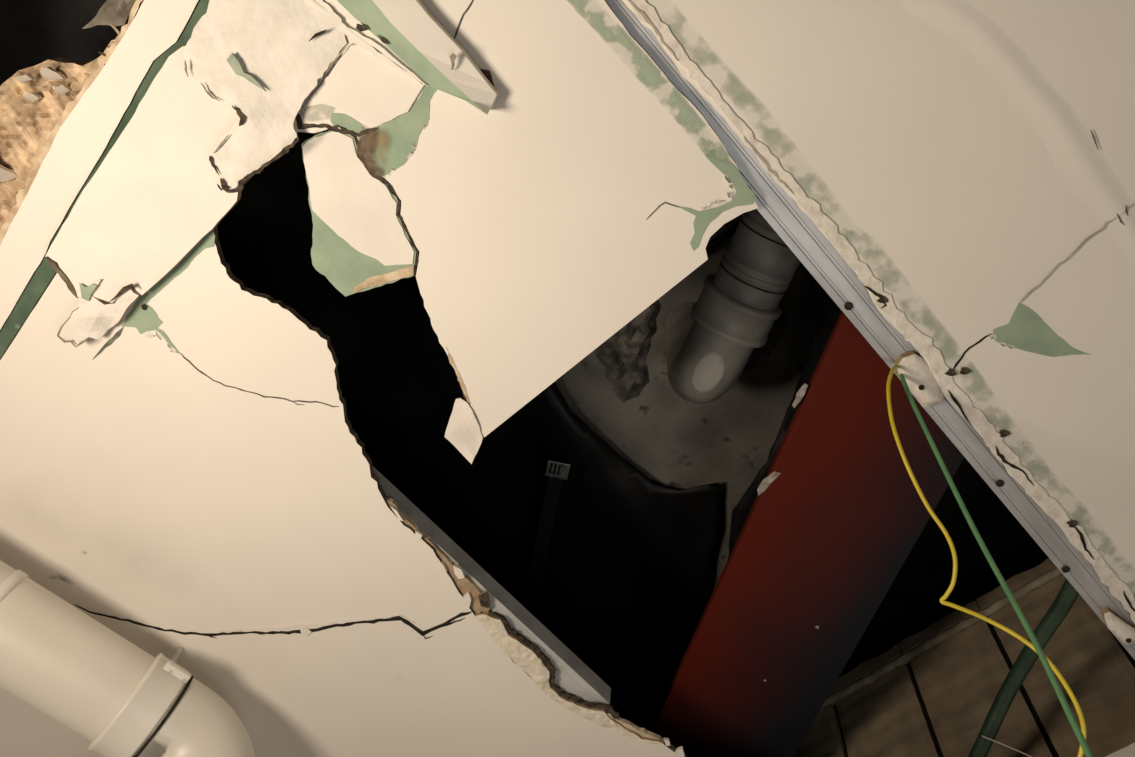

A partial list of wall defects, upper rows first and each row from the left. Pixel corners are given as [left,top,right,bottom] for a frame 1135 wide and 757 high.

peeling [302,83,437,177]
peeling [568,0,760,251]
peeling [121,230,215,354]
crack [181,353,339,407]
spalling [594,300,661,403]
crack [646,202,692,220]
peeling [792,383,808,408]
peeling [991,303,1091,357]
crack [1019,204,1135,303]
peeling [757,471,781,496]
crack [74,604,473,639]
spalling [386,497,685,757]